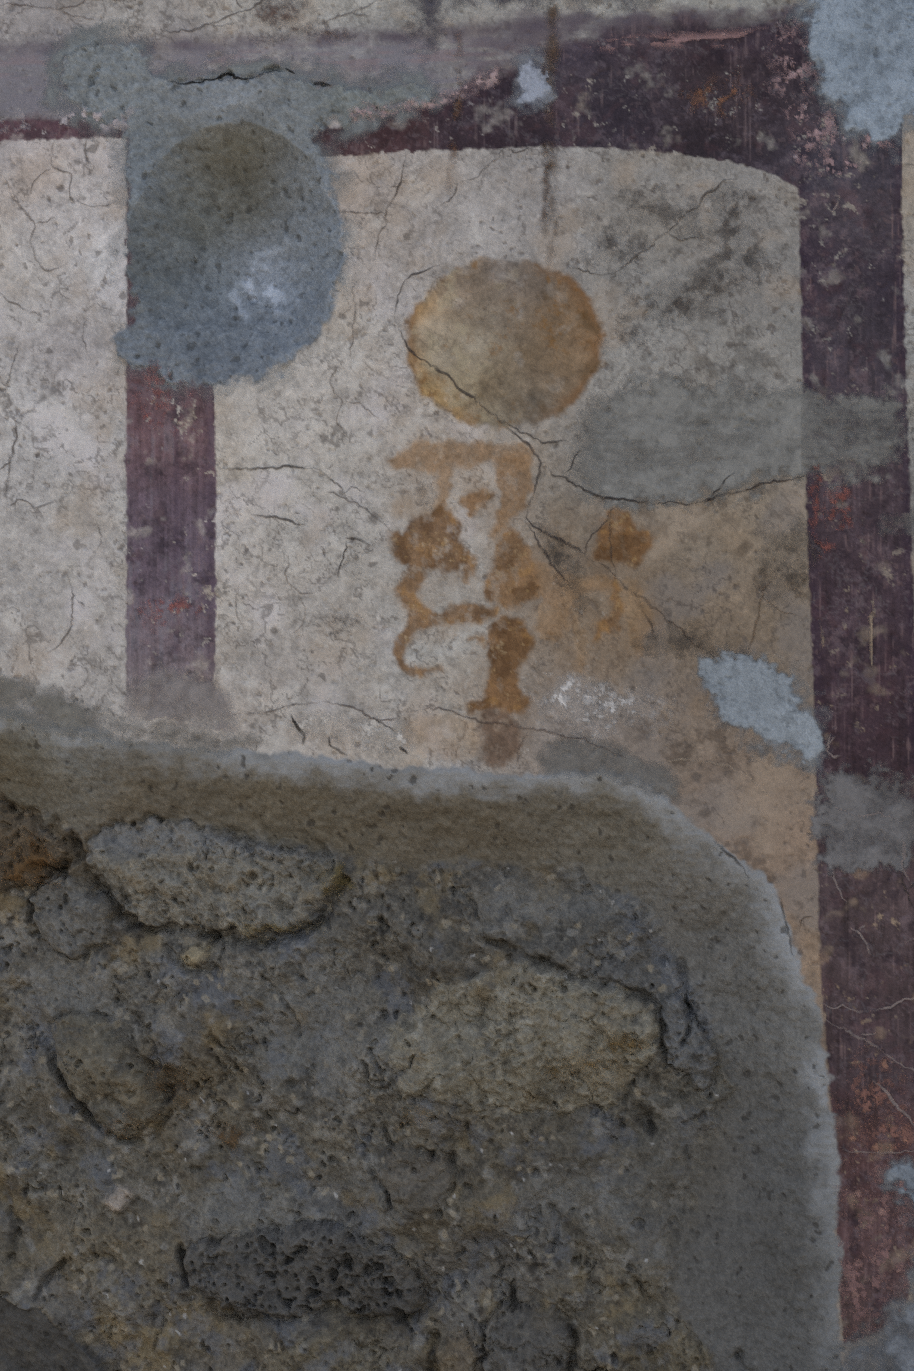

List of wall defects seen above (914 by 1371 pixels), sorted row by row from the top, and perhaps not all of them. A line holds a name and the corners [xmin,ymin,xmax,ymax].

crack [404,340,475,398]
crack [240,463,302,471]
crack [514,428,636,575]
crack [681,479,788,505]
spalling [0,711,914,1371]